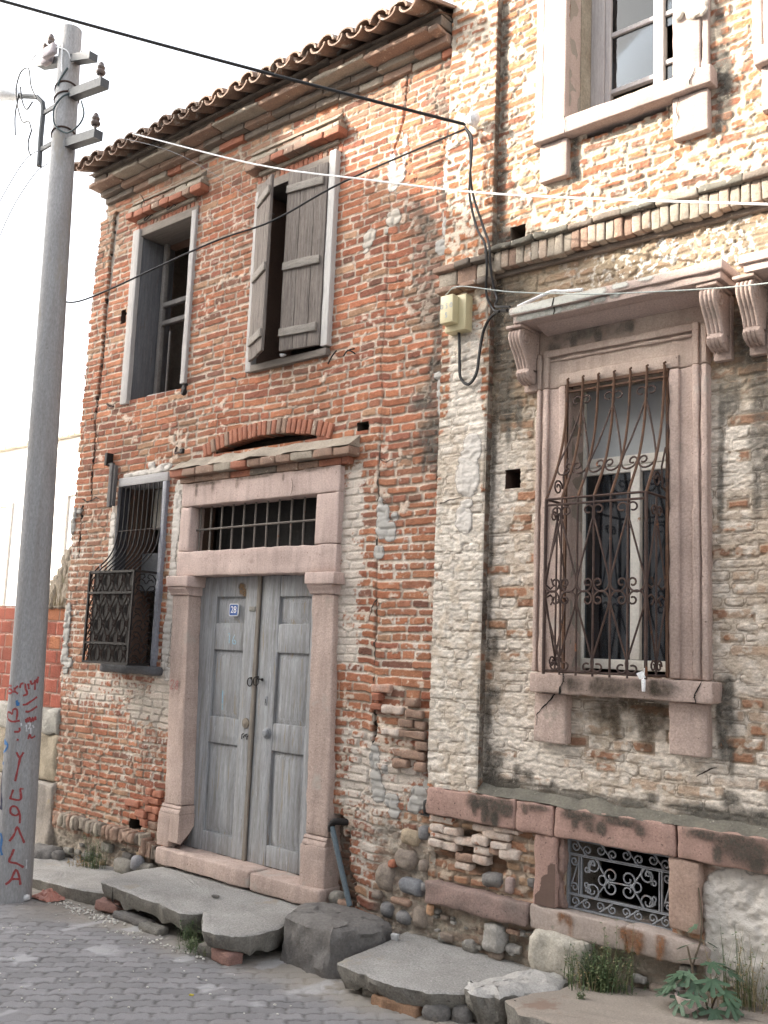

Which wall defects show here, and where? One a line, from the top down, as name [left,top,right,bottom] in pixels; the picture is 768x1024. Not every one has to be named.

spalling [370,684,429,774]
crack [536,673,565,725]
leakage [599,680,664,748]
leakage [716,677,734,775]
spalling [371,793,581,929]
leakage [562,794,655,836]
leakage [676,792,768,874]